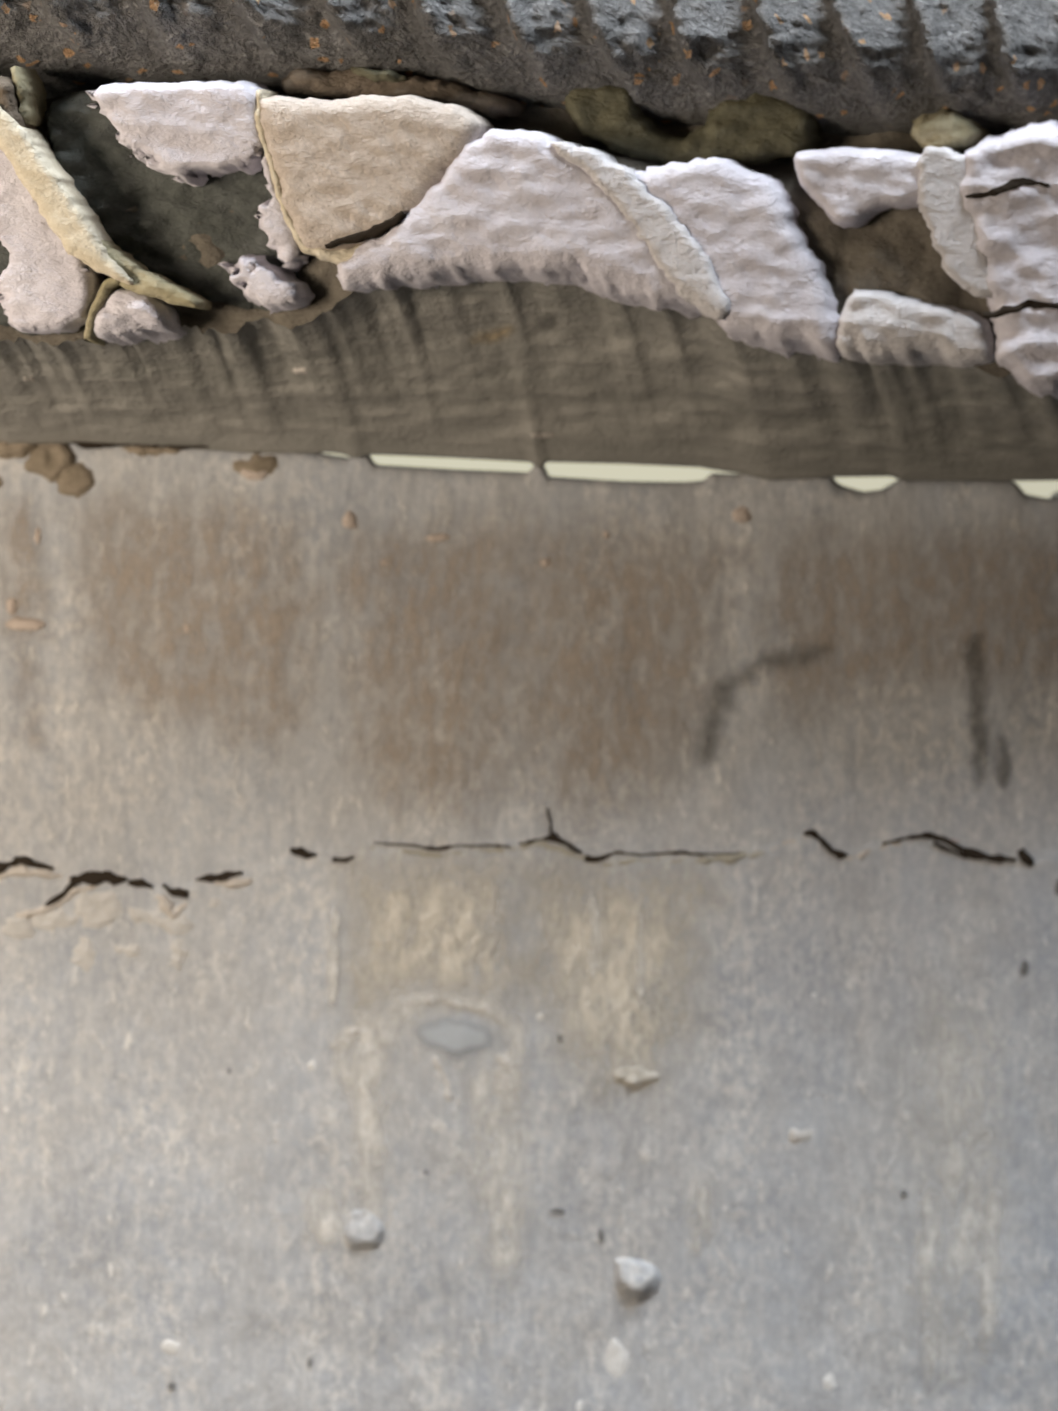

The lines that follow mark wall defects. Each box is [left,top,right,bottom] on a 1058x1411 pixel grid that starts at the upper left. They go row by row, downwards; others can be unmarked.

crack [0,856,253,920]
water stain [327,871,509,1003]
water stain [541,879,686,1076]
crack [290,808,1034,867]
water stain [471,1071,524,1270]
water stain [920,1029,999,1364]